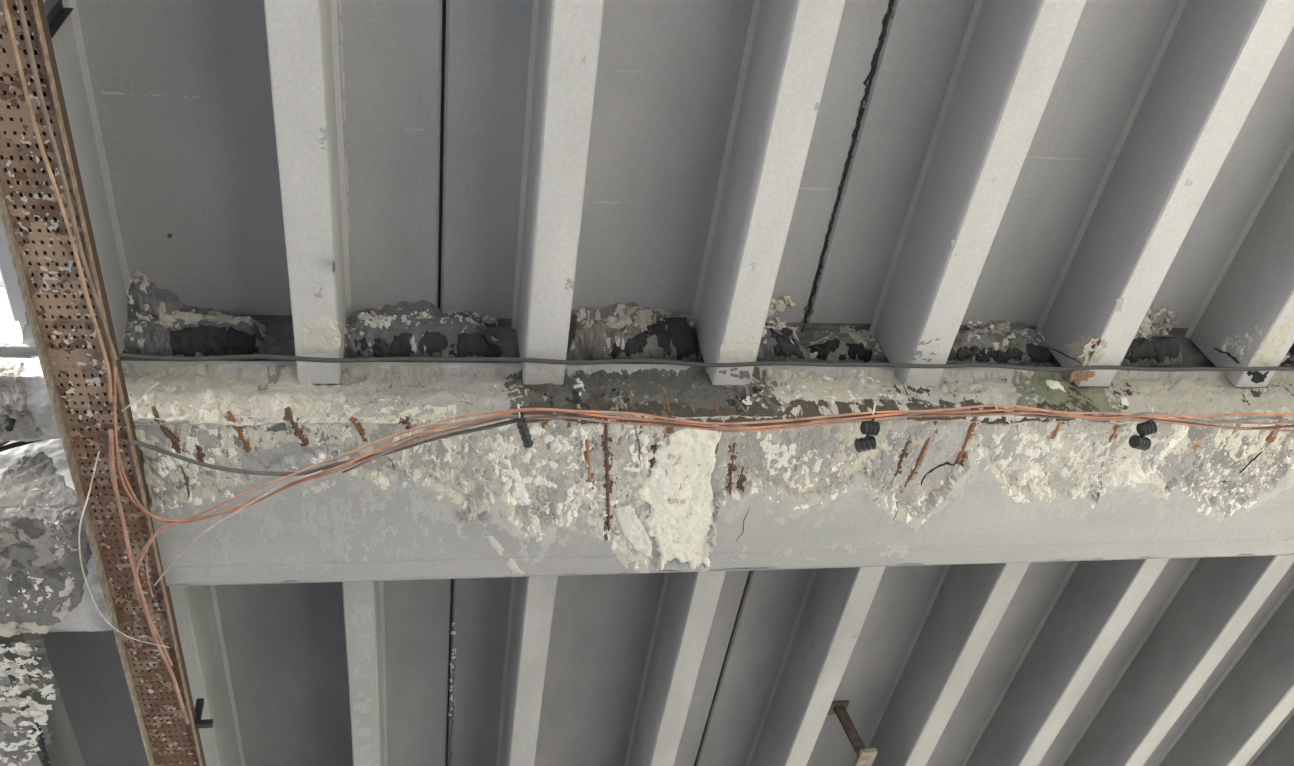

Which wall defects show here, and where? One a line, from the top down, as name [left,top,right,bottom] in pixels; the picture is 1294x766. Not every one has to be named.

crack [801,0,892,332]
spalling [0,361,44,443]
rust [154,418,205,462]
rust [283,413,309,450]
spalling [93,316,677,568]
rust [583,434,614,540]
rust [725,445,748,495]
rust [955,419,988,467]
spalling [708,318,1294,520]
peeling [486,536,525,574]
peeling [0,639,62,762]